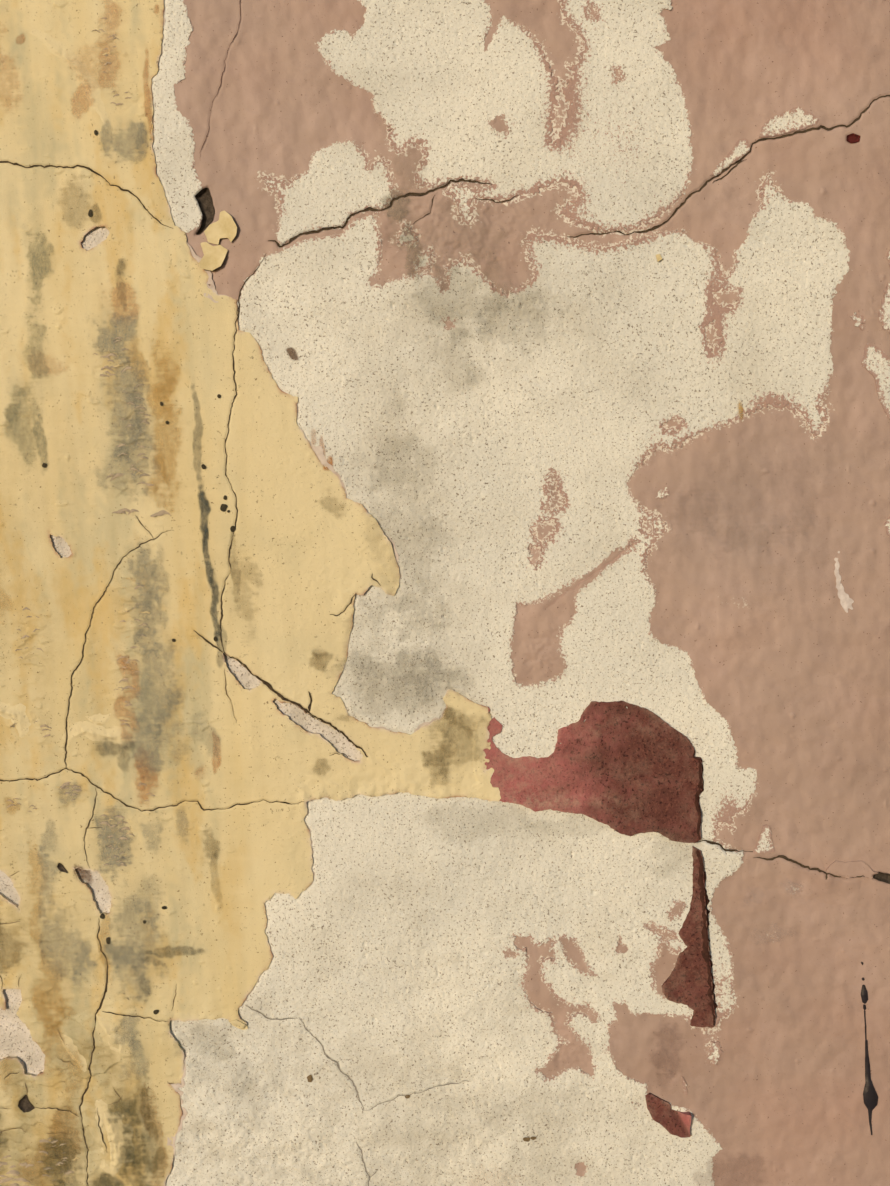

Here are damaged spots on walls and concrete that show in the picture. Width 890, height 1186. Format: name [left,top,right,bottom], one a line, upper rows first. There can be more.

spalling [81,227,109,251]
peeling [152,0,237,271]
crack [567,95,890,238]
crack [194,178,519,757]
damp [199,491,236,642]
peeling [166,0,850,1186]
crack [0,515,302,868]
crack [696,840,868,879]
crack [246,1005,463,1111]
crack [356,1142,377,1186]